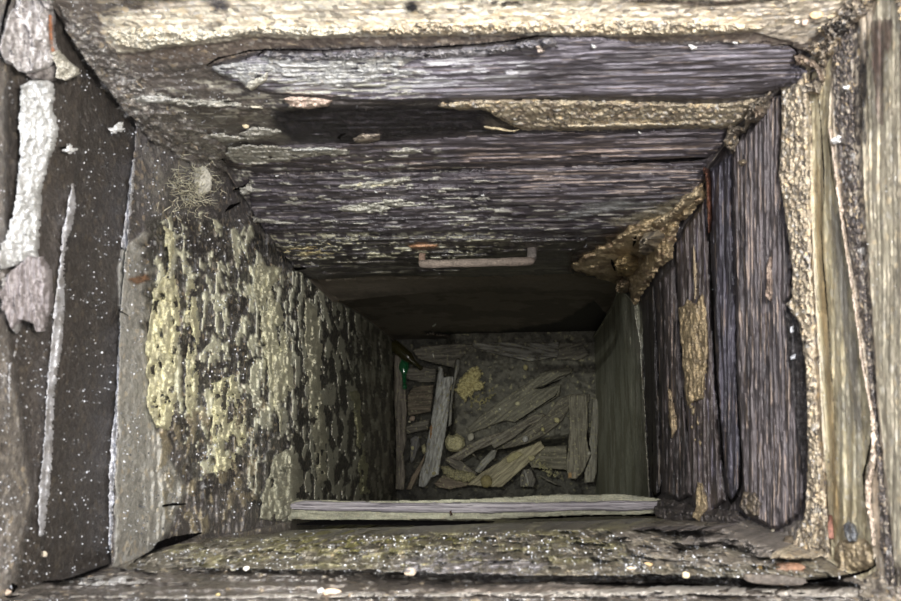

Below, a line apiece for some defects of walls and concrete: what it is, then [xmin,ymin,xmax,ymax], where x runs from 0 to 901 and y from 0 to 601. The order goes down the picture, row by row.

crack [206,35,556,66]
peeling [353,133,381,143]
leakage [284,243,334,258]
rust [409,242,437,250]